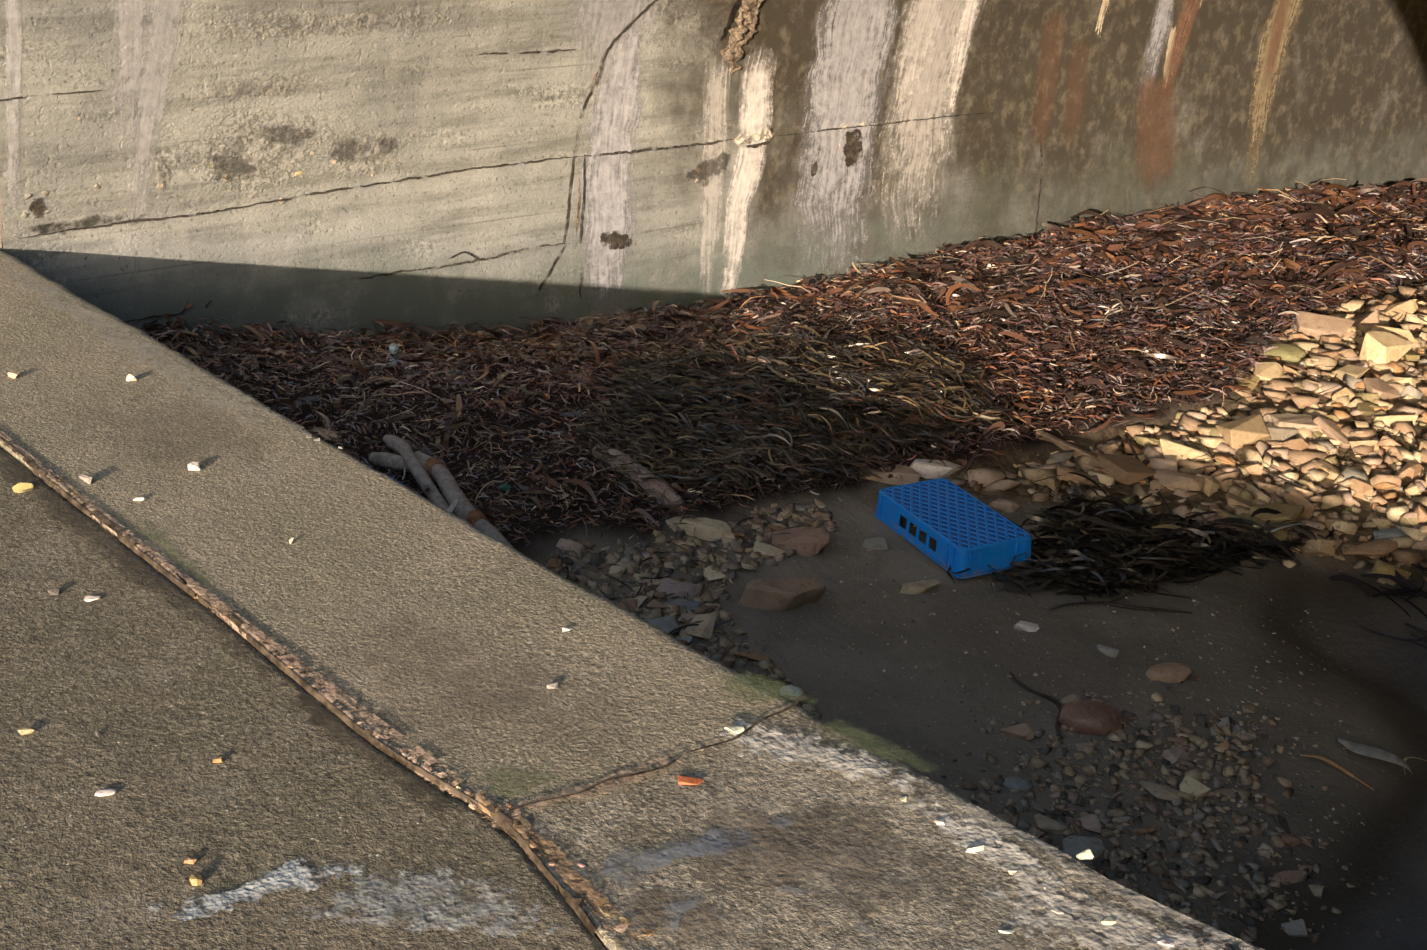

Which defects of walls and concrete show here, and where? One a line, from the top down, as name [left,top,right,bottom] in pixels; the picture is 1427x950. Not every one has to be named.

damp [6,0,22,189]
damp [118,0,184,194]
crack [18,0,732,298]
damp [579,0,652,307]
crack [720,0,765,76]
crack [775,113,987,136]
damp [799,0,978,256]
damp [1095,0,1109,36]
damp [1147,0,1176,88]
damp [0,447,268,676]
damp [281,680,444,811]
crack [0,437,805,938]